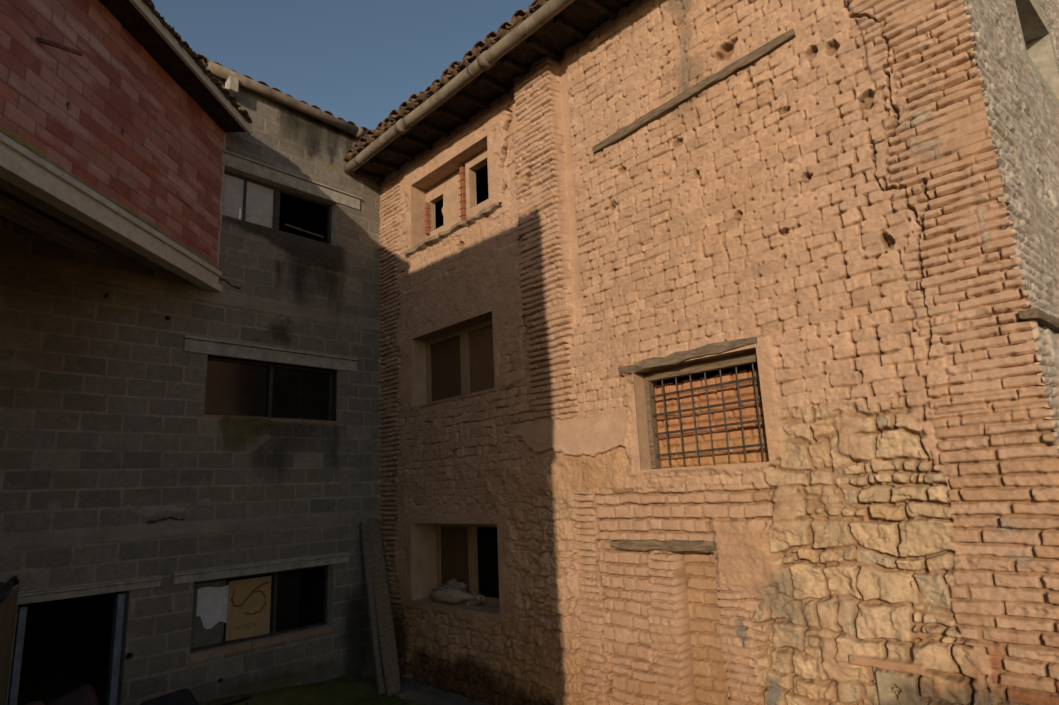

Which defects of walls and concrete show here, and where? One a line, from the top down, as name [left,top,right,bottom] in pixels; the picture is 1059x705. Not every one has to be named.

crack [846,1,933,356]
flaking render [507,407,631,456]